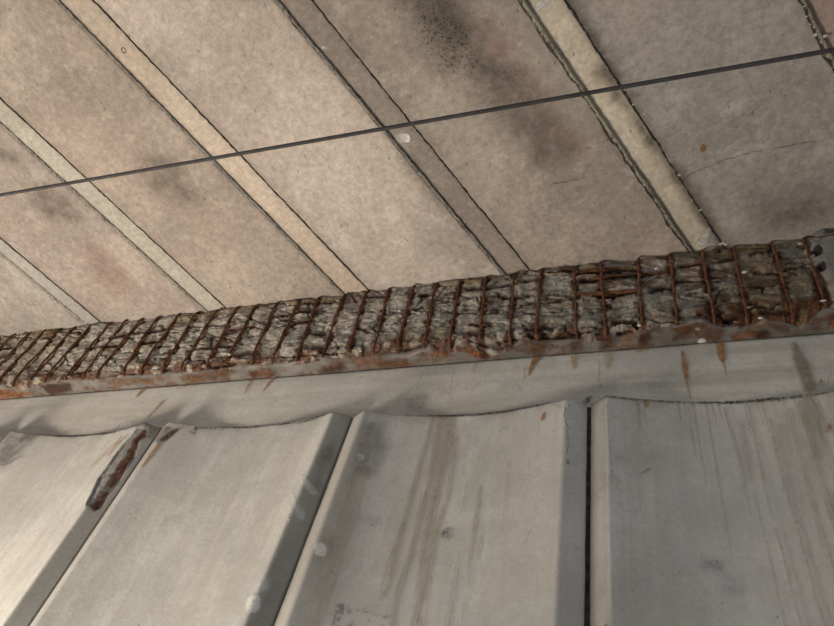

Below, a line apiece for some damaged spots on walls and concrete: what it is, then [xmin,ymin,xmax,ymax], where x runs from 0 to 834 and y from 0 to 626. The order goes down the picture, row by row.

spalling [0,229,834,390]